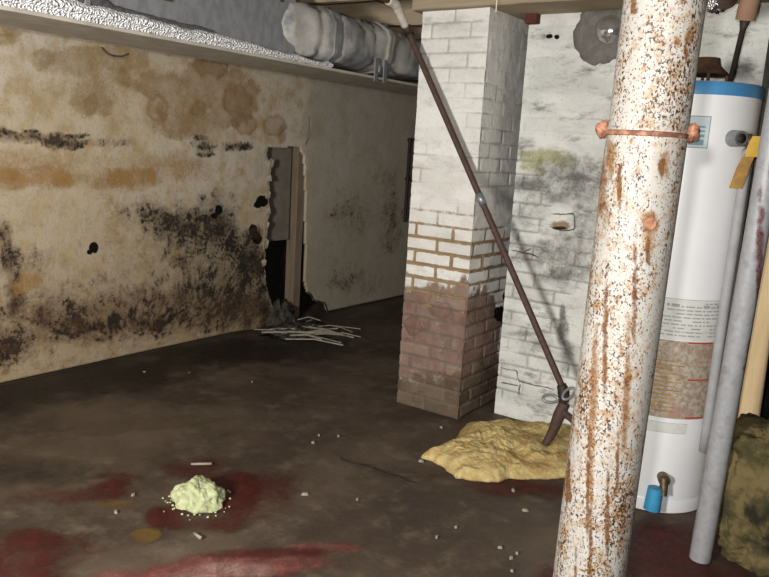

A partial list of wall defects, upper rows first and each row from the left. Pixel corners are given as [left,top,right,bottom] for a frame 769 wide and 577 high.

rust [674,32,692,60]
damp [0,128,89,150]
damp [191,135,253,157]
damp [522,151,600,200]
rust [598,146,622,238]
rust [658,153,667,176]
rust [642,213,658,265]
damp [0,187,333,412]
peeling [399,211,510,406]
rust [626,251,637,343]
rust [586,287,609,577]
rust [605,357,632,566]